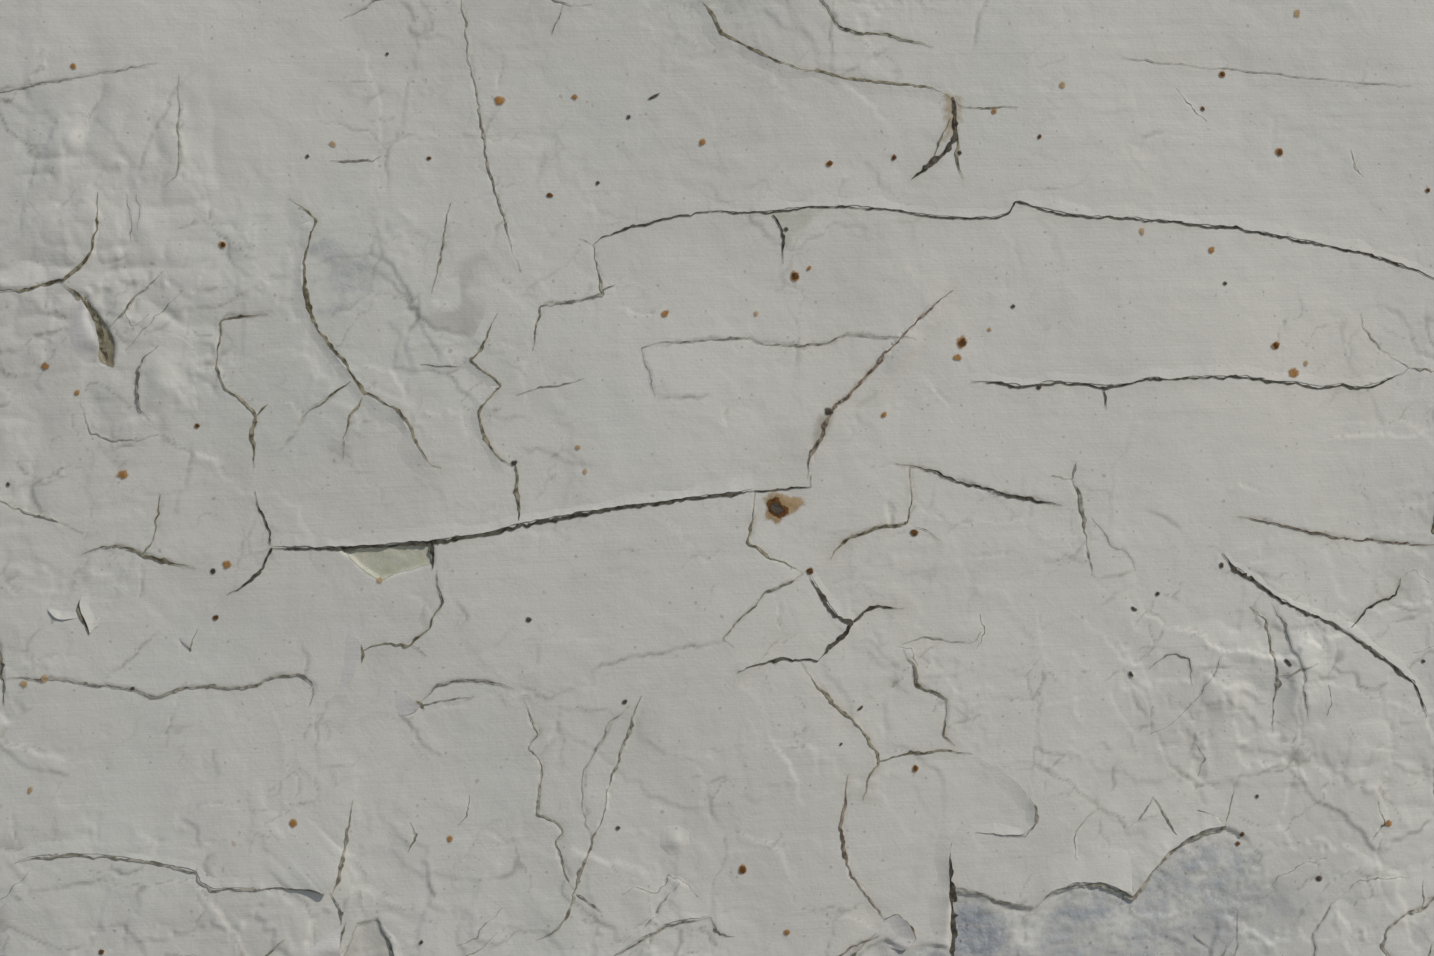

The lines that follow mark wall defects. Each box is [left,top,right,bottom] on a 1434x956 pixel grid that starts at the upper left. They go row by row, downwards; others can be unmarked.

crack [533,0,1434,349]
crack [0,196,99,292]
peeling [61,282,182,367]
crack [971,319,1434,408]
crack [0,494,196,569]
rust [766,494,803,523]
crack [1239,516,1434,545]
crack [216,200,1095,956]
crack [0,651,314,705]
crack [1223,550,1434,724]
crack [13,840,344,925]
peeling [884,755,1039,956]